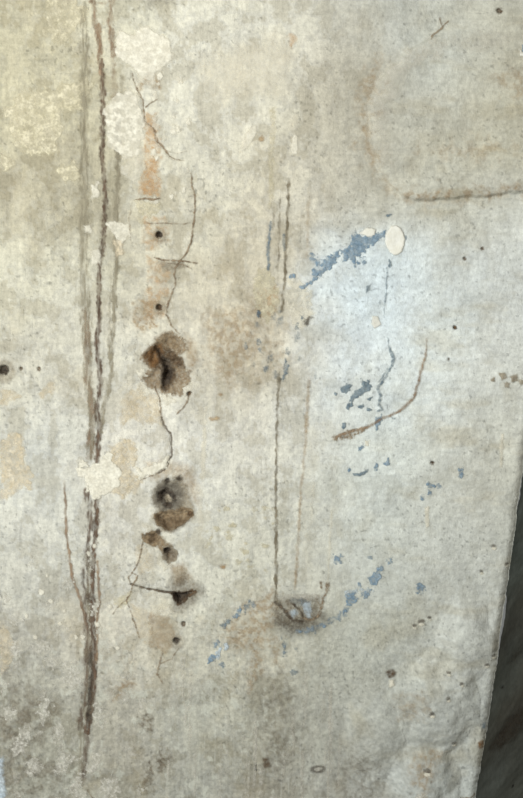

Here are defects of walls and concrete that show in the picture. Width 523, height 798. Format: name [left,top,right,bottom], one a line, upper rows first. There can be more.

crack [132,73,174,159]
crack [154,176,197,332]
crack [144,386,189,479]
crack [121,541,174,637]